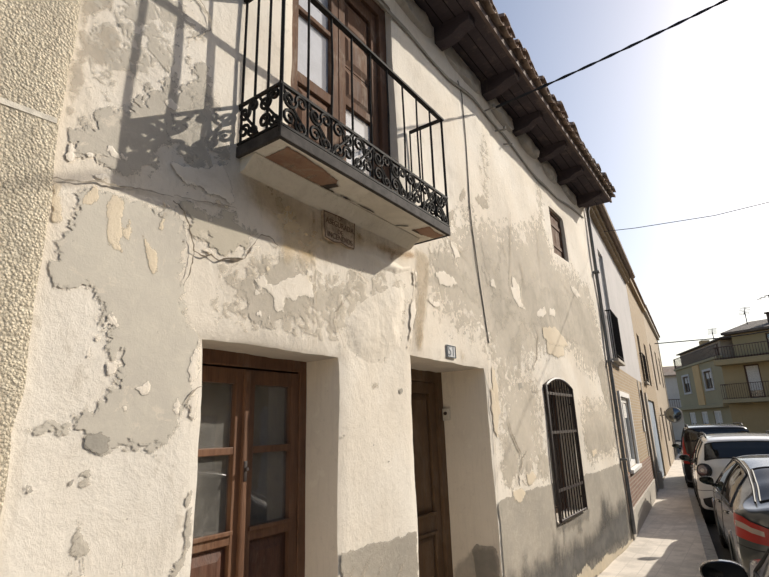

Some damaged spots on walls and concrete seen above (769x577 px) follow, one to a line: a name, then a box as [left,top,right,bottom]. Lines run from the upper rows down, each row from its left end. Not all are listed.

peeling [28,56,258,456]
crack [53,177,280,284]
peeling [225,252,314,336]
peeling [412,227,604,417]
crack [487,370,527,481]
peeling [69,470,91,488]
peeling [502,437,549,503]
peeling [70,523,90,570]
peeling [170,490,192,577]
water stain [527,502,630,577]